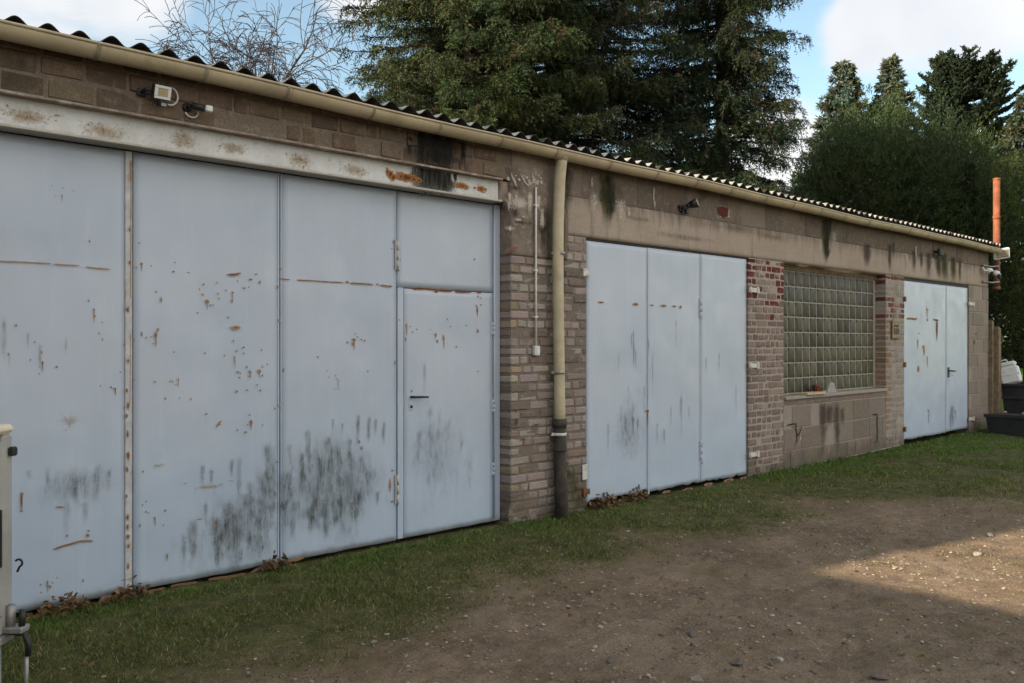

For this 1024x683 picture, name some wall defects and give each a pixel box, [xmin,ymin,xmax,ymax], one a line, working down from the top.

rust [386,167,422,183]
damp [407,133,466,197]
rust [454,182,486,193]
damp [590,176,630,224]
damp [819,220,837,256]
rust [0,261,111,270]
rust [197,273,261,314]
damp [821,407,844,442]